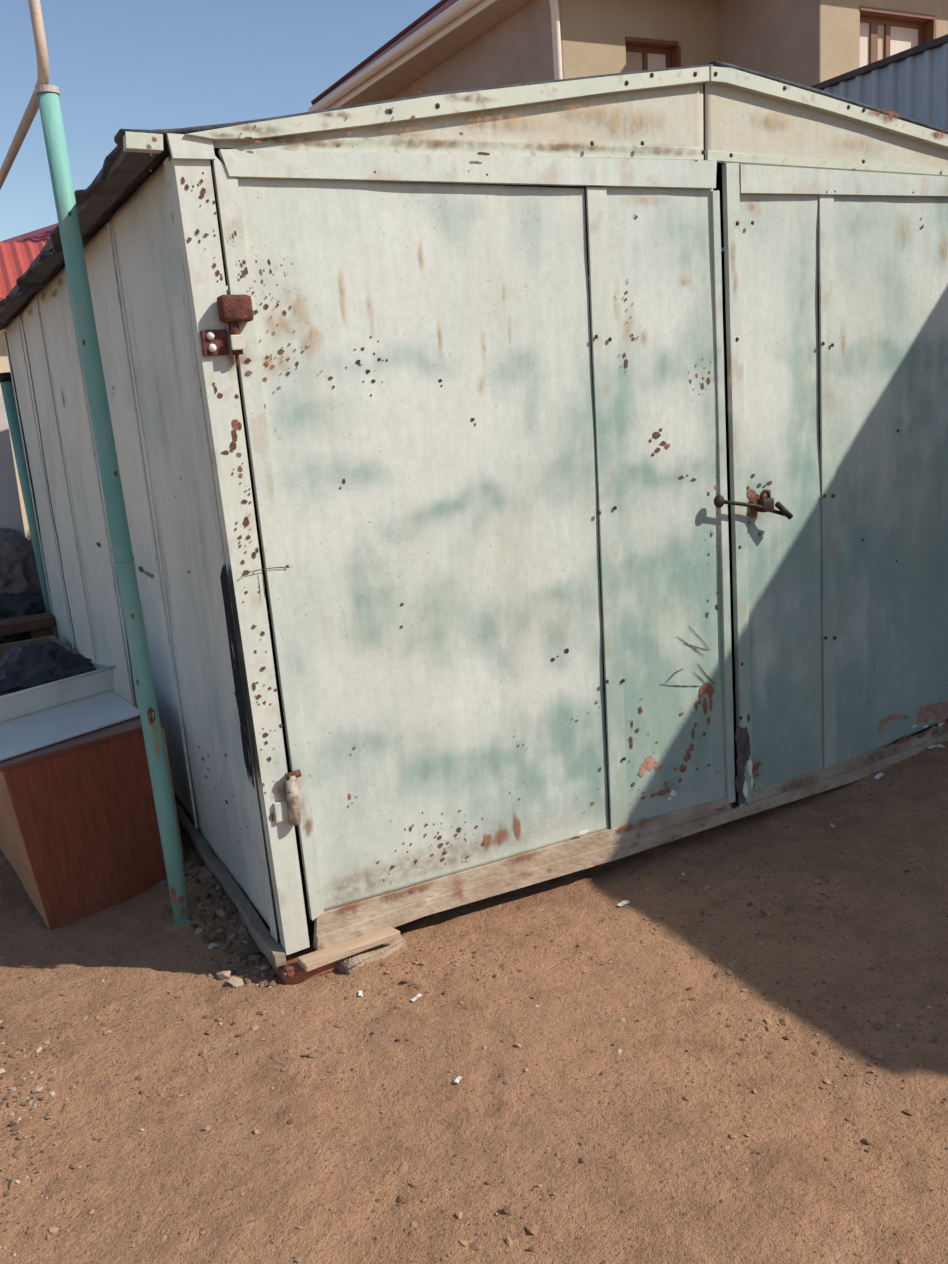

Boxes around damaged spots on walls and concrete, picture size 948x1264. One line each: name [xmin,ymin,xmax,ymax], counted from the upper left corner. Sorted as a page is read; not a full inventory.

rust [221,419,242,457]
rust [680,682,714,724]
peeling [629,698,718,804]
peeling [735,714,753,807]
rust [484,818,520,846]